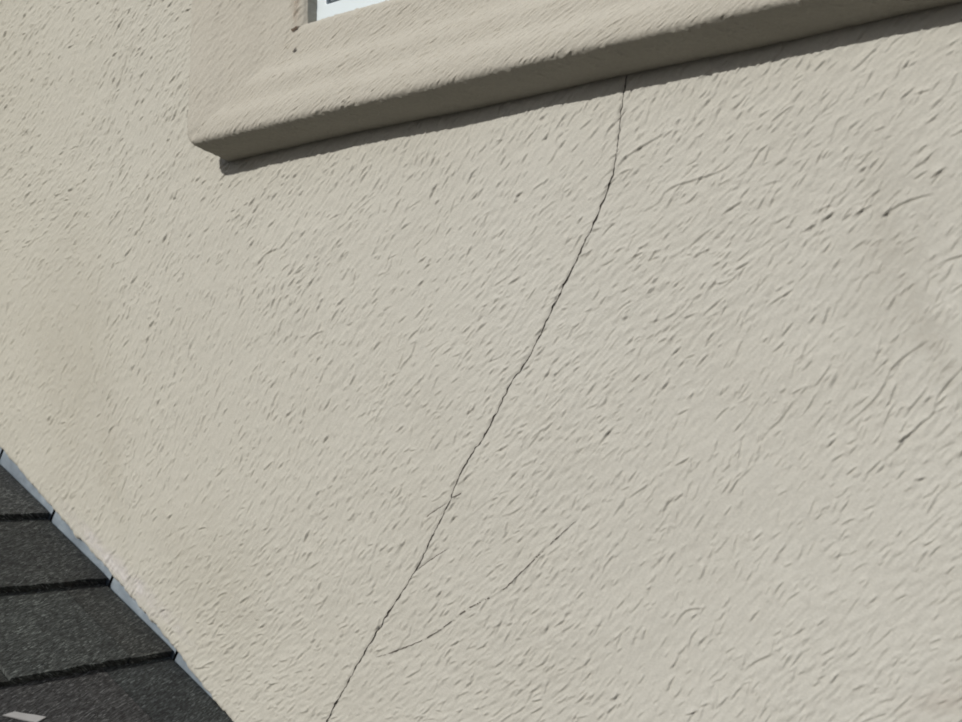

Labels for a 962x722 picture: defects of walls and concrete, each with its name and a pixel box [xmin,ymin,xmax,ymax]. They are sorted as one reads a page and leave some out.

crack [326,76,627,722]